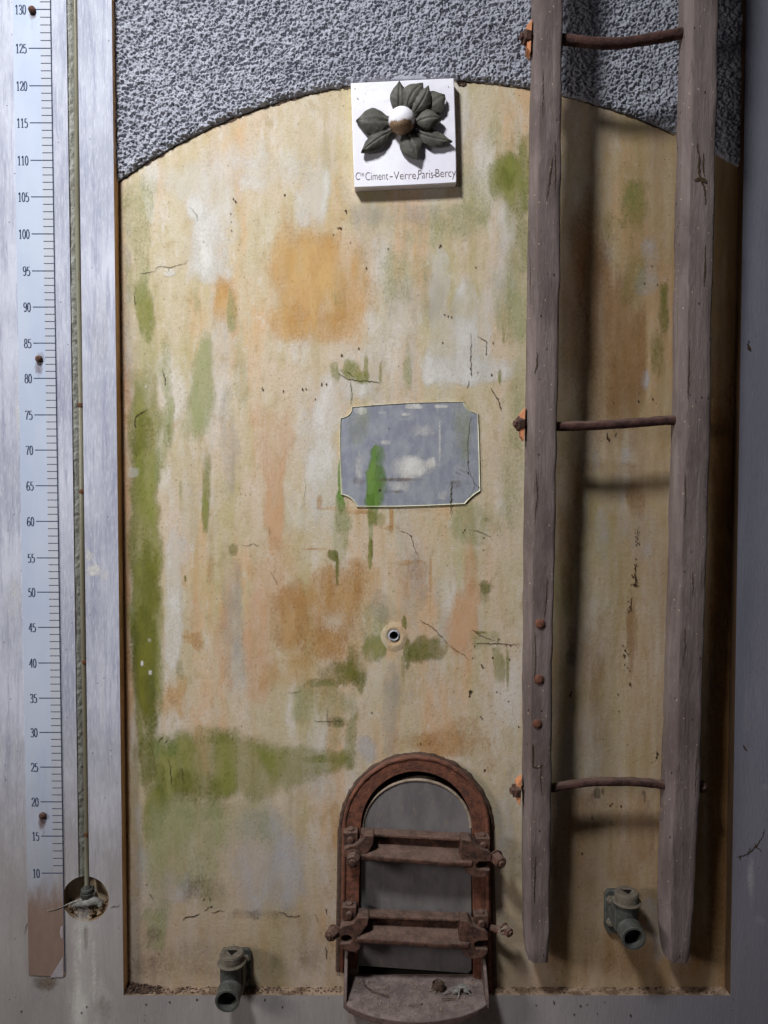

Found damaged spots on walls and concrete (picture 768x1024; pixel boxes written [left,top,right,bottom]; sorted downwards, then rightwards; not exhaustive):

leakage [123,523,164,947]
crack [423,622,516,659]